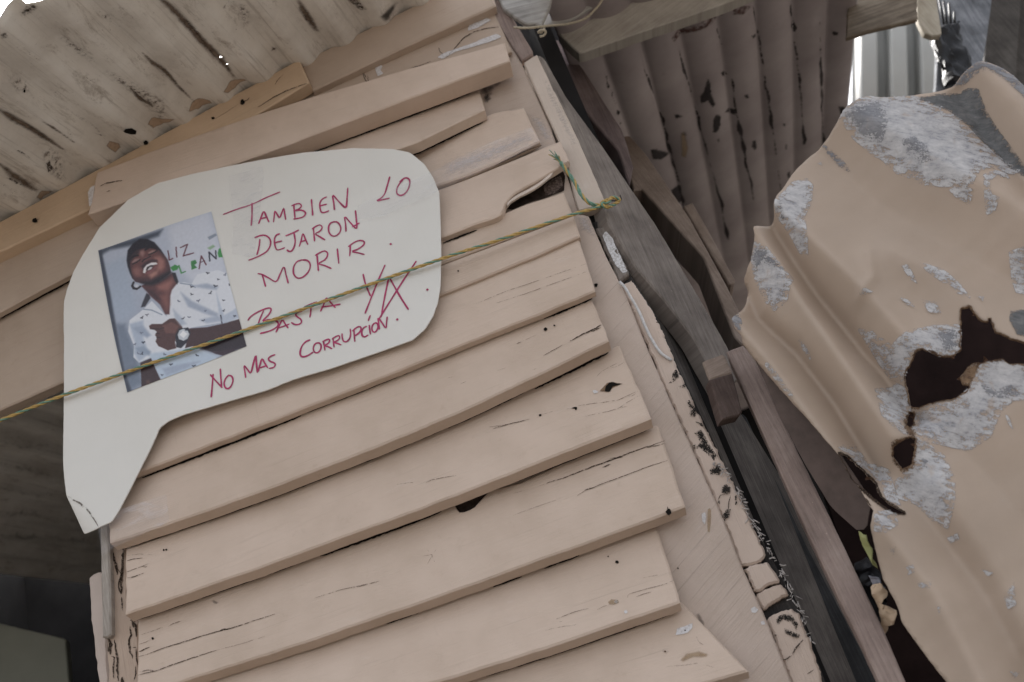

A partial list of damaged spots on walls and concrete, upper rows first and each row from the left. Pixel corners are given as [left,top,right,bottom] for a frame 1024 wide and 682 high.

peeling [840,61,1024,214]
peeling [774,180,813,255]
peeling [751,242,793,311]
peeling [902,264,984,301]
peeling [839,298,1024,543]
crack [548,441,668,494]
crack [138,614,274,675]